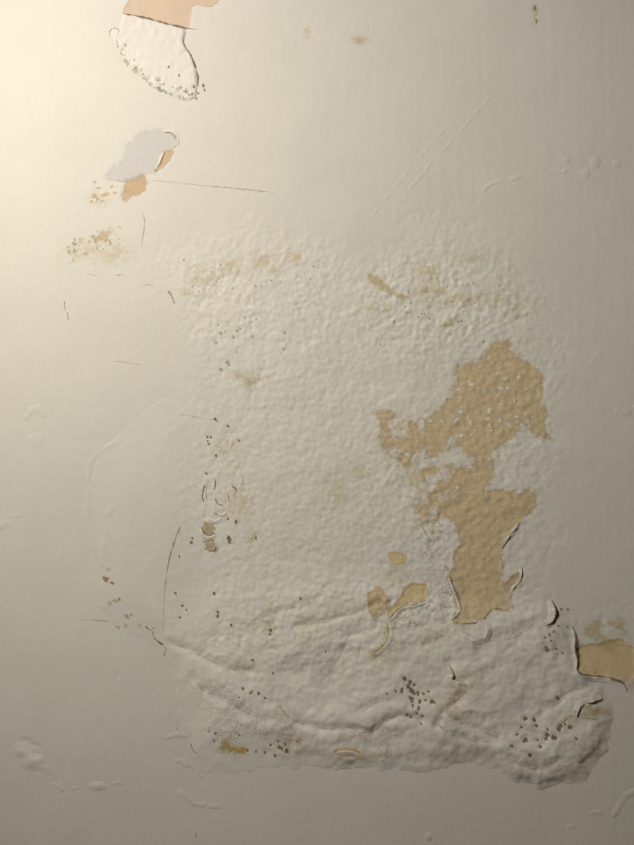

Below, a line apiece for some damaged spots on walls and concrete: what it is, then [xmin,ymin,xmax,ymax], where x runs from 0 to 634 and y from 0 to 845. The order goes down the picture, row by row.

peeling [123,0,219,28]
peeling [105,129,180,202]
peeling [367,340,553,660]
peeling [544,599,558,628]
peeling [570,618,634,692]